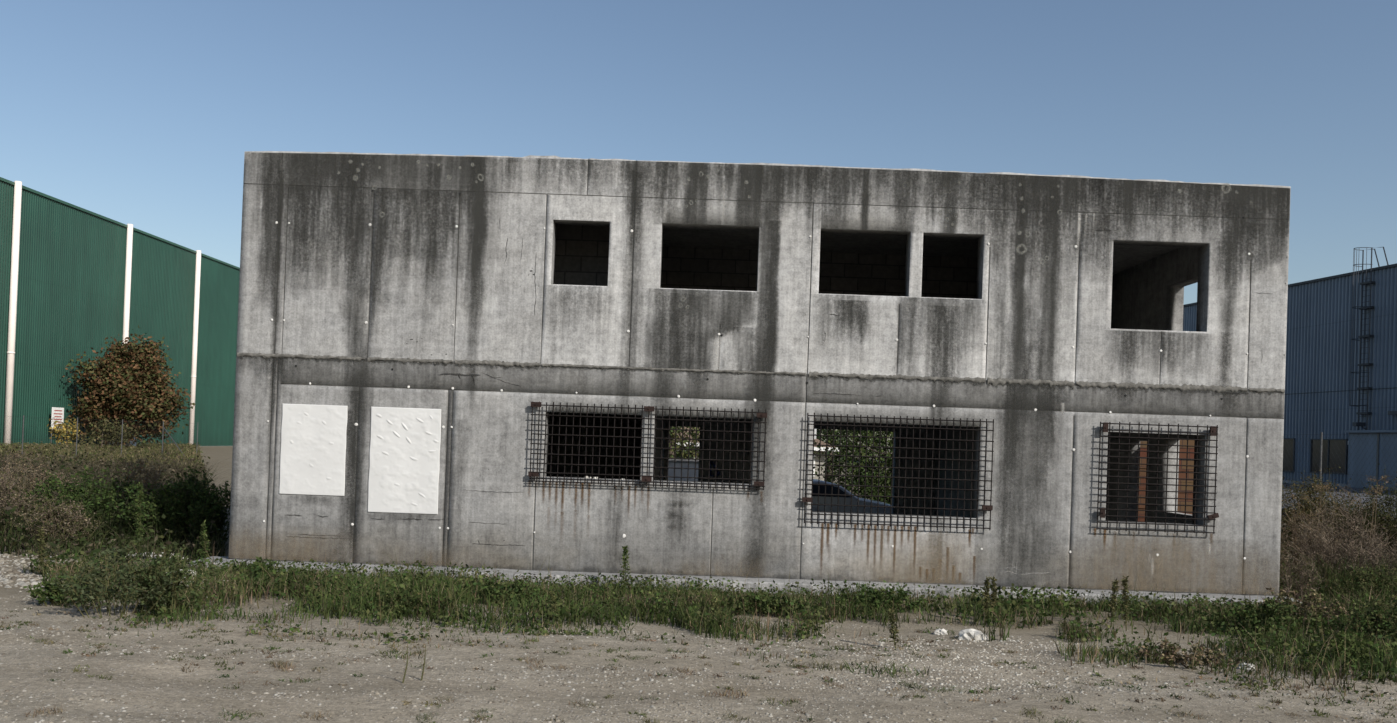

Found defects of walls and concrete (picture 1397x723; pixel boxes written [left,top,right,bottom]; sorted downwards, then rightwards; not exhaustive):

damp [251,152,516,540]
damp [622,161,1289,568]
corrosion [529,482,590,506]
corrosion [821,523,837,562]
corrosion [854,524,975,580]